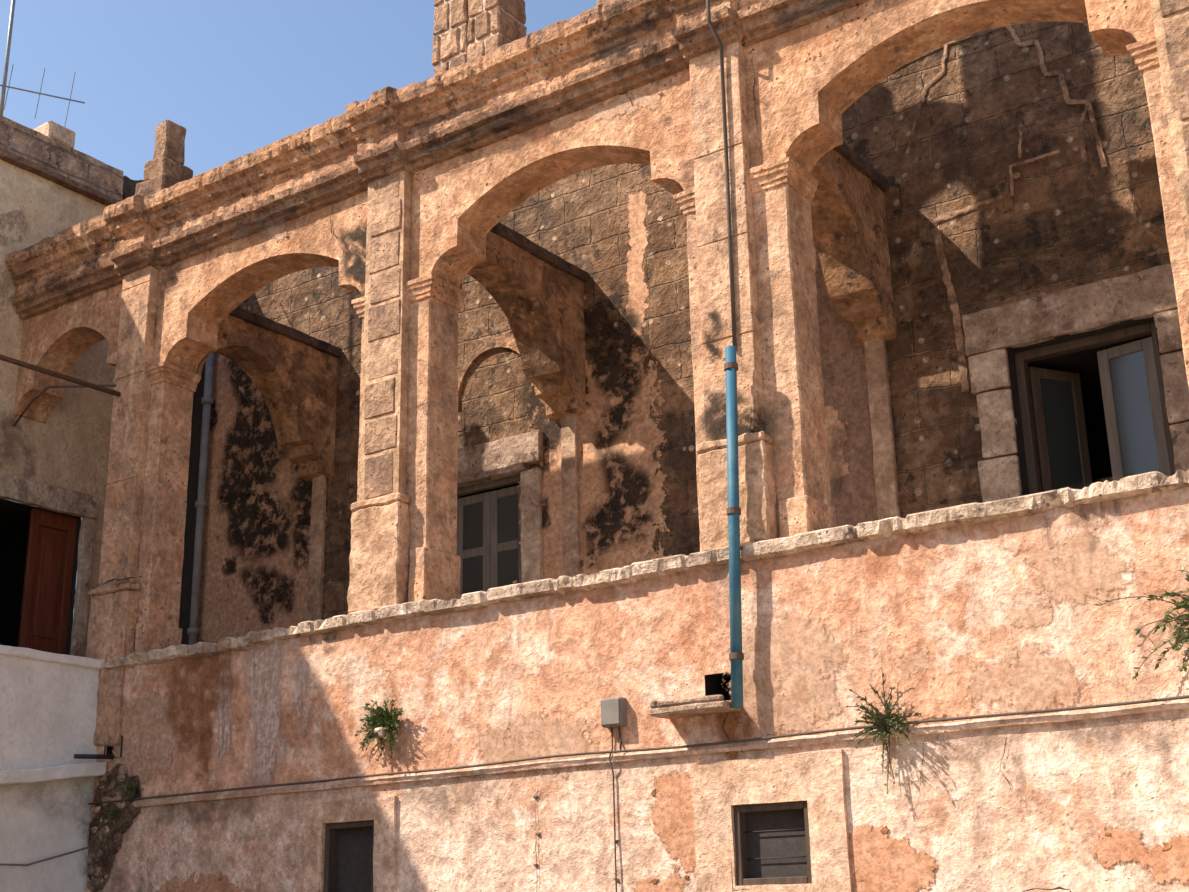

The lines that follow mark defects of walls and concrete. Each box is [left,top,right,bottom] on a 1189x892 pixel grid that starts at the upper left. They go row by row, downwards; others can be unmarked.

peeling [151,870,250,892]
peeling [633,770,696,892]
peeling [848,824,938,892]
crack [1022,884,1071,892]
peeling [1092,824,1189,885]